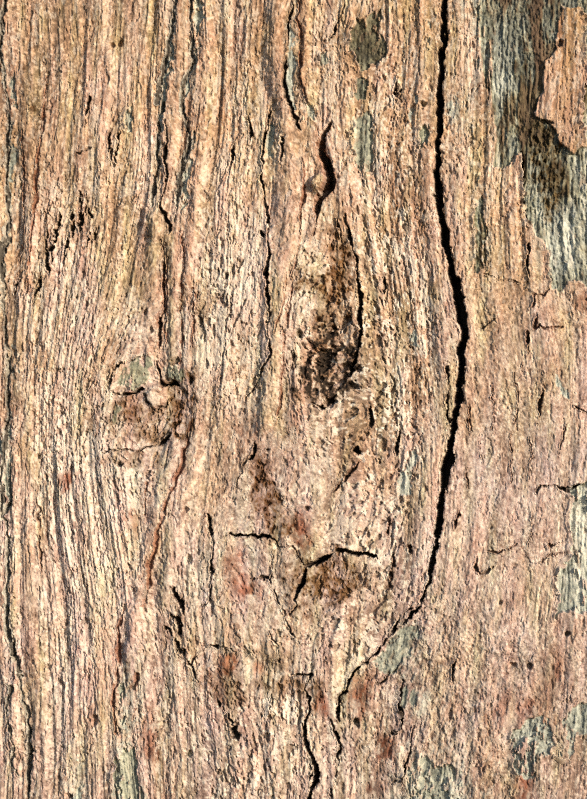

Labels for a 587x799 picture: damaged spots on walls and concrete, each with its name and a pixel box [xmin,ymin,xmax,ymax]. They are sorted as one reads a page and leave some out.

crack [73,146,94,156]
peeling [468,0,587,296]
crack [0,0,62,799]
crack [101,0,203,736]
water stain [56,211,369,496]
crack [182,0,581,799]
spalling [472,556,499,576]
peeling [537,480,587,623]
crack [557,405,587,458]
peeling [505,701,587,781]